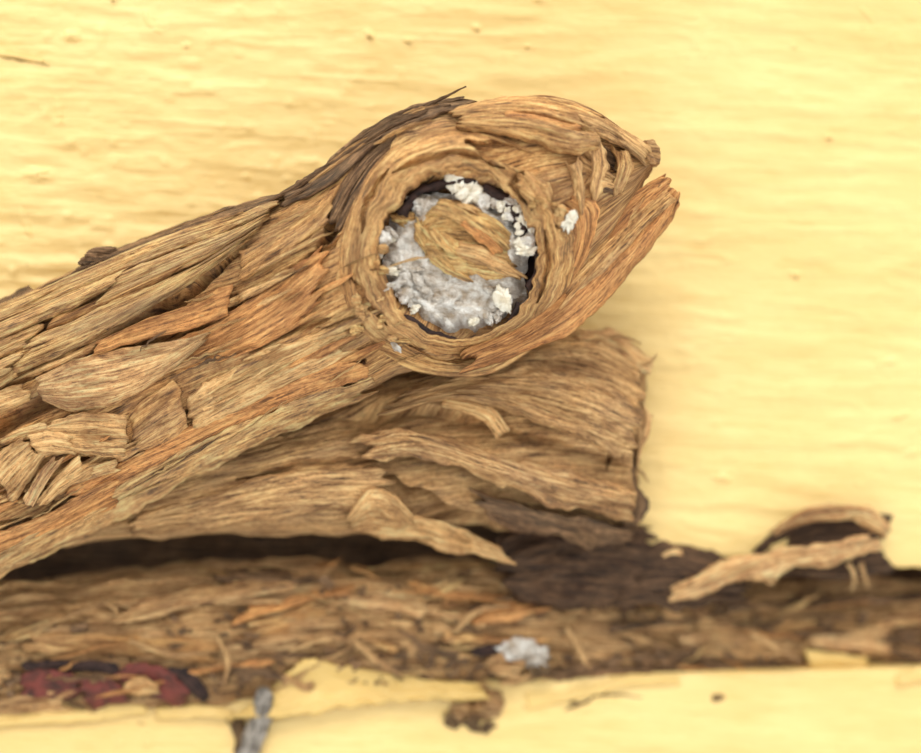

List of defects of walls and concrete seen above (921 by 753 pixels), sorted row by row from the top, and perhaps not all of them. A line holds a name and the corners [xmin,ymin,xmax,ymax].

peeling [494,503,895,613]
peeling [804,650,869,667]
peeling [895,665,921,686]